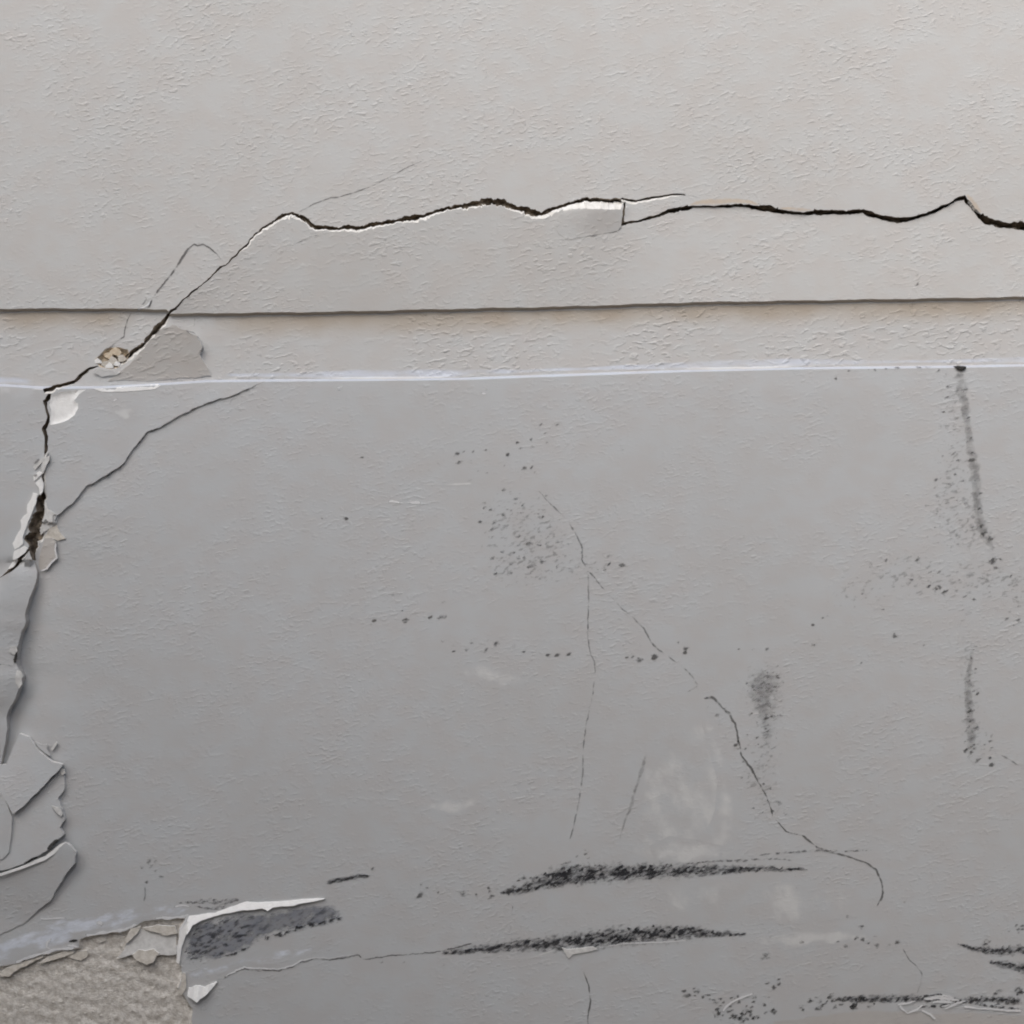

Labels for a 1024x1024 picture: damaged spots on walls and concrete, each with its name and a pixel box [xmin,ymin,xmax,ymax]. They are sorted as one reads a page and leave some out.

peeling [49,390,85,425]
flaking render [93,347,129,377]
crack [1,161,1024,577]
peeling [0,452,77,934]
crack [710,696,884,904]
damp [500,850,831,894]
flaking render [0,898,340,1024]
damp [444,925,745,954]